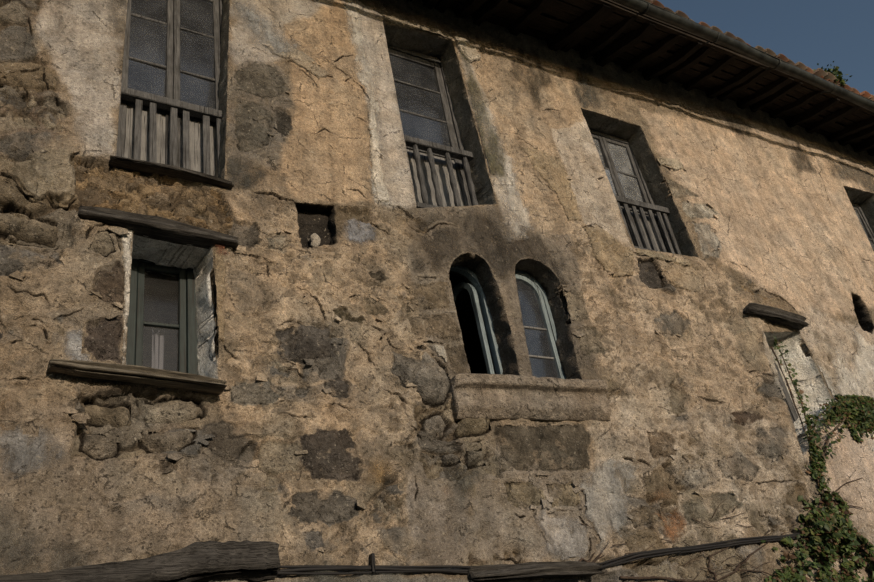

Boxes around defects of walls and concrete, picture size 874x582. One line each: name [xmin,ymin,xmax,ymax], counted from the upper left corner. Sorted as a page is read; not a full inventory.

crack [282,53,381,169]
peeling [0,147,80,283]
crack [247,168,311,206]
crack [343,186,460,240]
spalling [79,221,133,365]
spalling [60,375,291,477]
spalling [272,268,594,516]